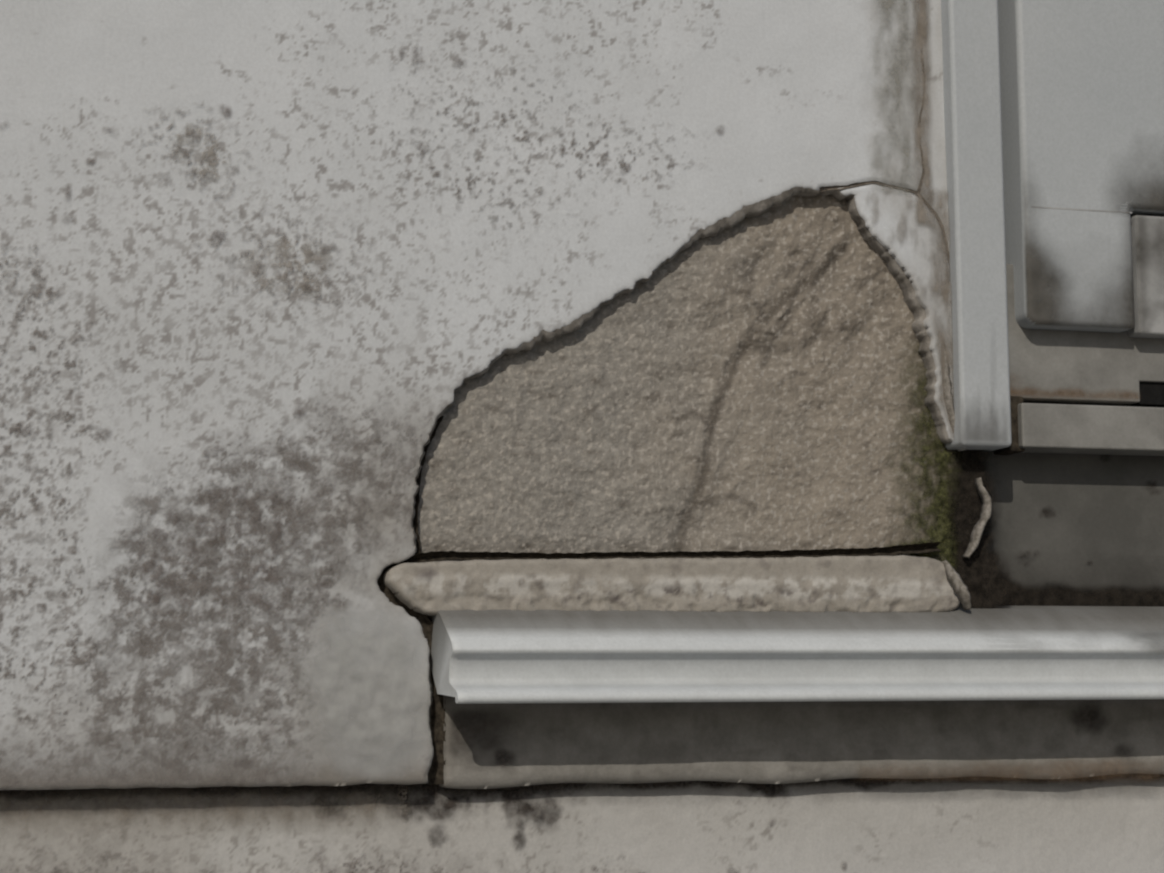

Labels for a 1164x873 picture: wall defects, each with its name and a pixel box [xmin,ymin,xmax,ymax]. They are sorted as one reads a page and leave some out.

damp [882,0,951,305]
spalling [412,187,992,610]
damp [937,329,952,402]
crack [377,416,941,785]